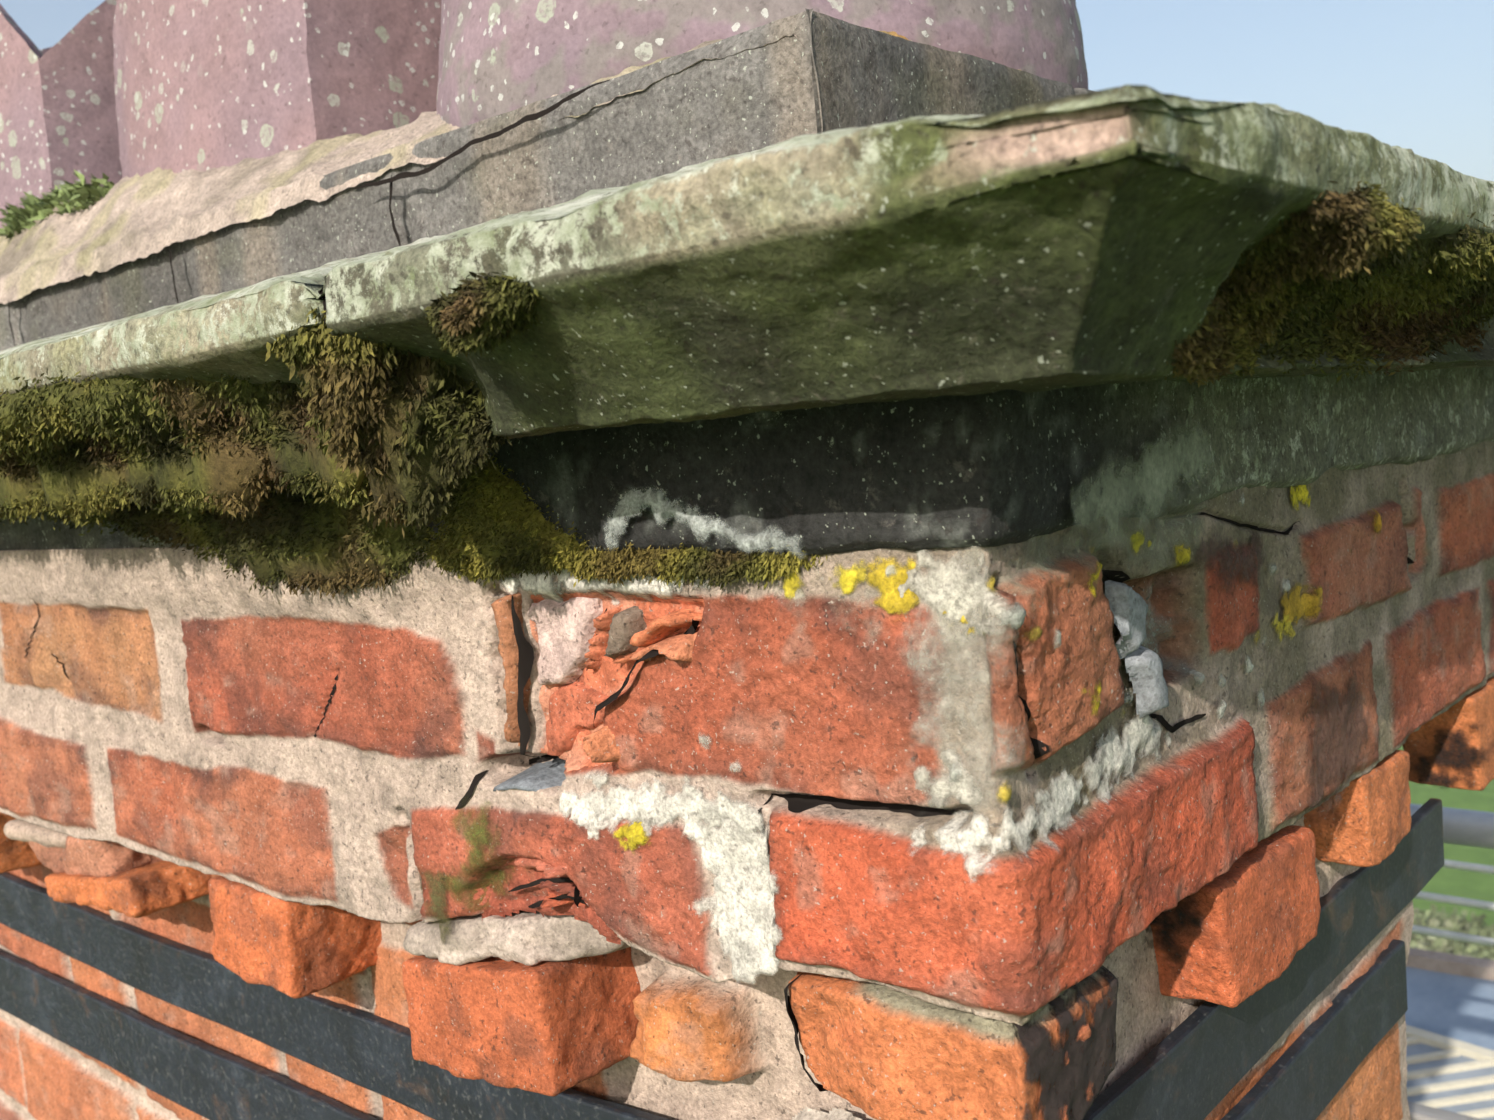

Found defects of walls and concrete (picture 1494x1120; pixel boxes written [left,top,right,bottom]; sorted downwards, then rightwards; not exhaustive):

crack [354,80,609,246]
crack [170,247,179,304]
crack [1163,512,1300,535]
crack [1102,570,1130,583]
spalling [491,592,704,772]
crack [1013,640,1049,759]
crack [1149,713,1206,733]
crack [758,793,974,835]
crack [784,973,829,1092]
peeling [1066,1025,1091,1065]